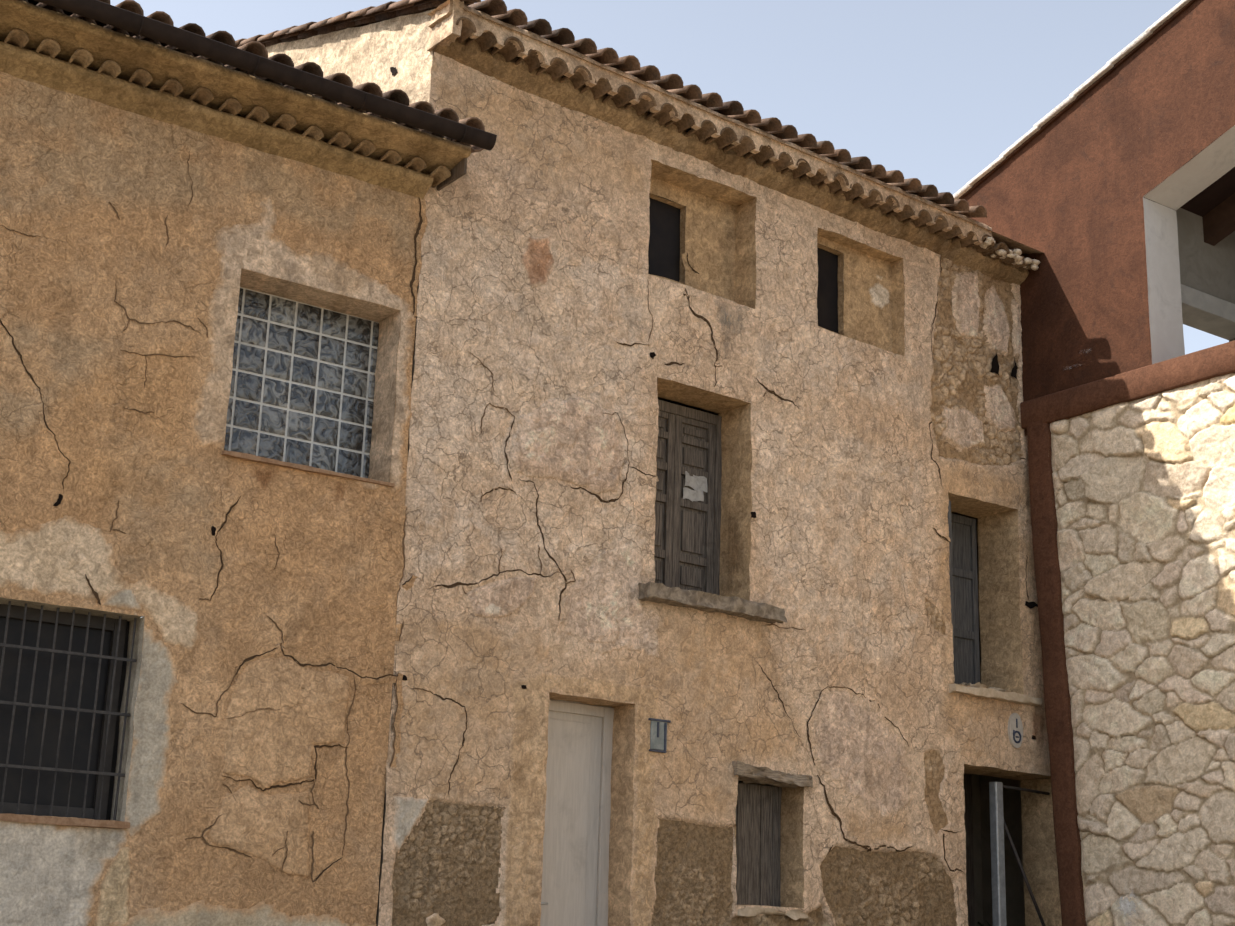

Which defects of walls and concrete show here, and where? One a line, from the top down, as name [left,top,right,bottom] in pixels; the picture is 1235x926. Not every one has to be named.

crack [114,288,208,414]
crack [410,198,428,317]
crack [616,253,722,387]
crack [754,378,801,414]
spalling [930,258,1024,467]
spalling [979,237,1041,271]
crack [391,353,576,641]
crack [569,412,659,508]
crack [181,610,467,887]
crack [755,664,964,877]
spalling [392,800,503,926]
spalling [651,818,957,926]